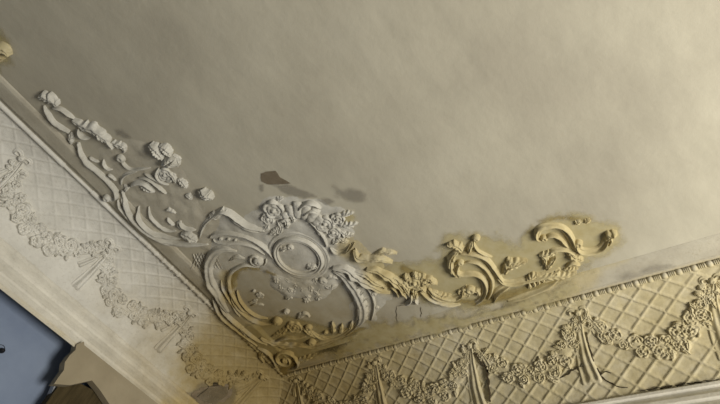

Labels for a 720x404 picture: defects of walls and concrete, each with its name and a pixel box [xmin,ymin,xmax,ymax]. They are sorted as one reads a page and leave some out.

peeling [261,171,289,185]
water stain [244,214,620,375]
crack [561,332,719,391]